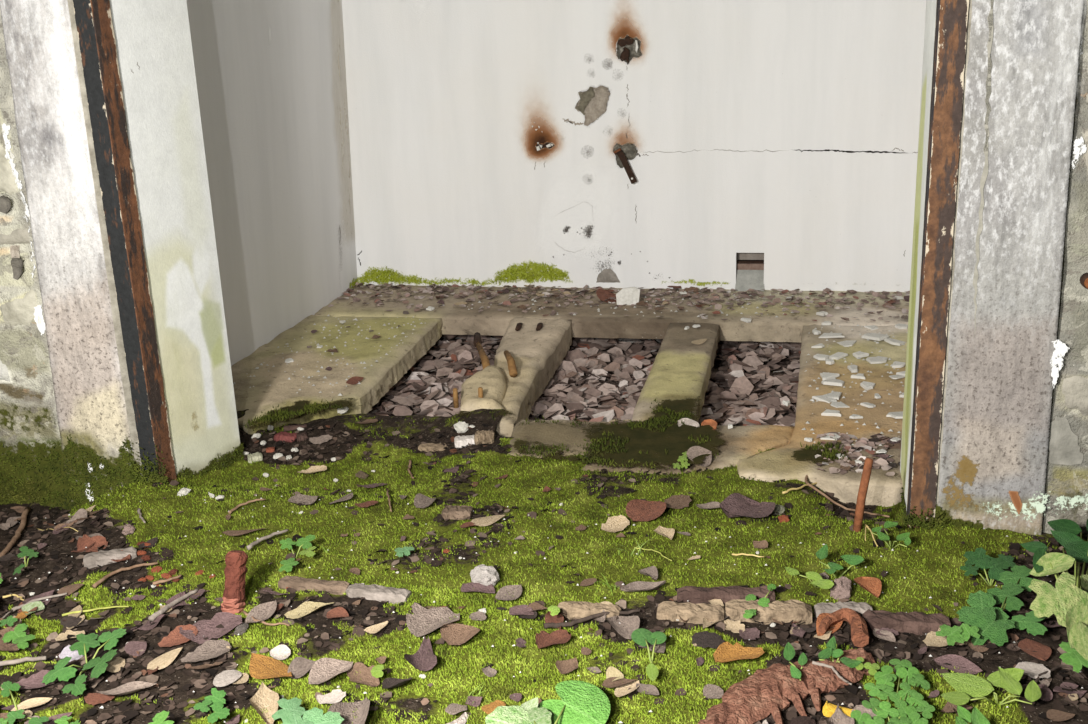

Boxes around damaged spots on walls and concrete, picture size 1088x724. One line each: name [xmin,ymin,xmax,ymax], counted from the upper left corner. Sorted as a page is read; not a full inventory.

corrosion [611,18,644,52]
flaking render [562,86,610,126]
corrosion [525,116,559,170]
corrosion [615,132,635,145]
crack [637,148,918,157]